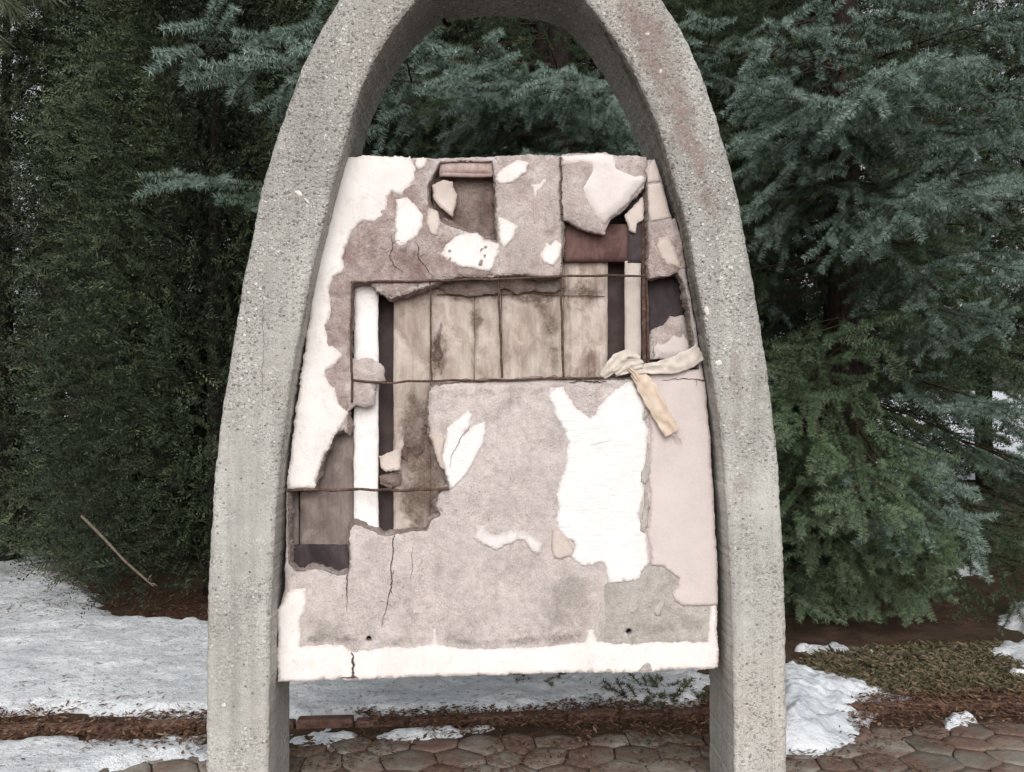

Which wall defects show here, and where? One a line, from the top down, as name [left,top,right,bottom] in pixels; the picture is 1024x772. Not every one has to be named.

crack [389,237,430,274]
peeling [315,154,566,488]
leakage [402,432,436,526]
peeling [287,375,709,652]
crack [381,535,413,626]